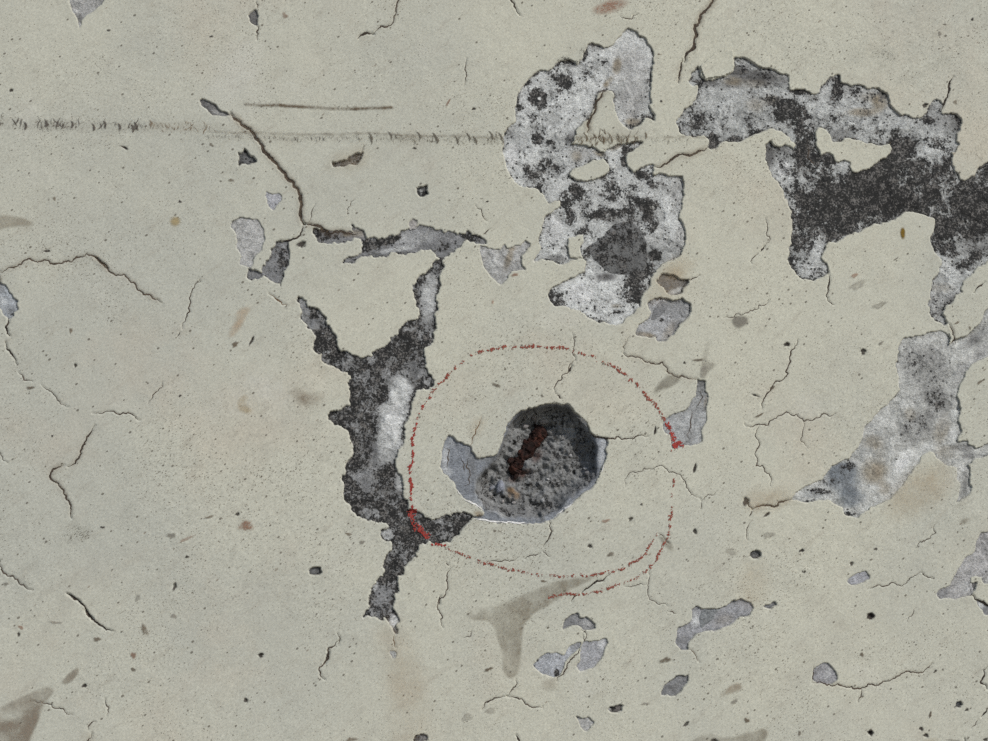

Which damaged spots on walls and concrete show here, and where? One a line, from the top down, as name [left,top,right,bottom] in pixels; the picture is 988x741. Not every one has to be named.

crack [230,113,357,242]
crack [3,253,162,303]
peeling [676,50,988,518]
crack [5,318,64,405]
peeling [231,29,690,634]
crack [49,381,163,518]
crack [745,340,833,537]
crack [67,593,112,631]
peeling [533,613,608,677]
peeling [675,599,776,650]
crack [812,666,930,699]
peeling [936,532,988,615]